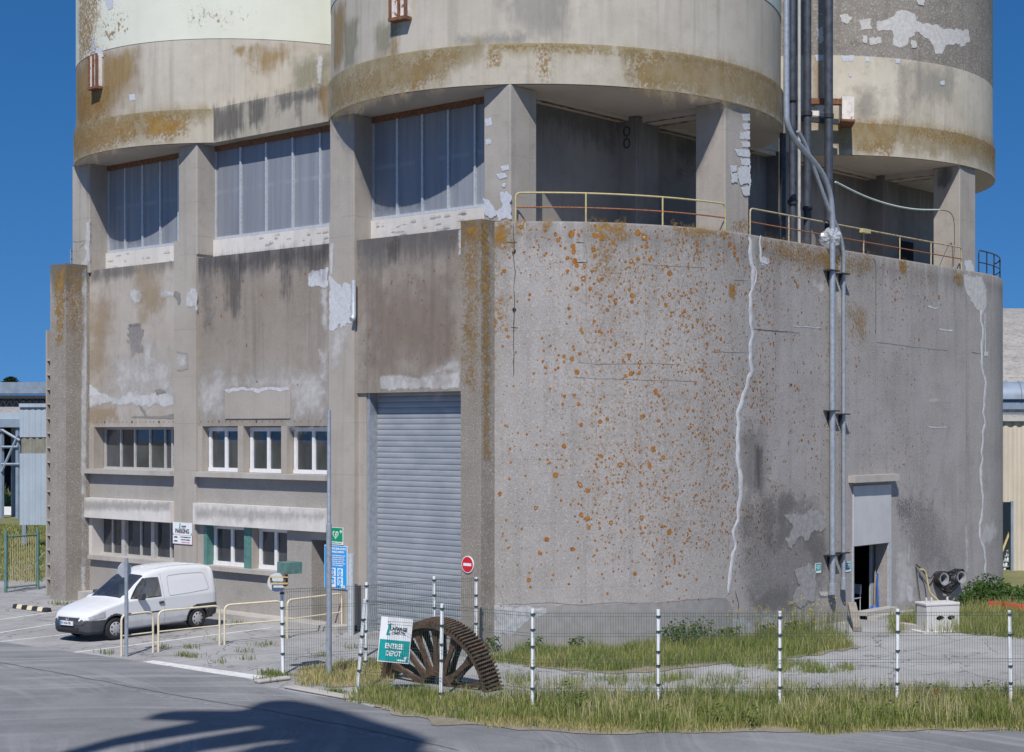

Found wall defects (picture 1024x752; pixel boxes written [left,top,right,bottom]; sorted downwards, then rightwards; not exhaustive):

corrosion [74,52,179,160]
peeling [89,385,174,419]
crack [497,222,799,618]
flaking render [785,508,826,549]
flaking render [790,563,830,608]